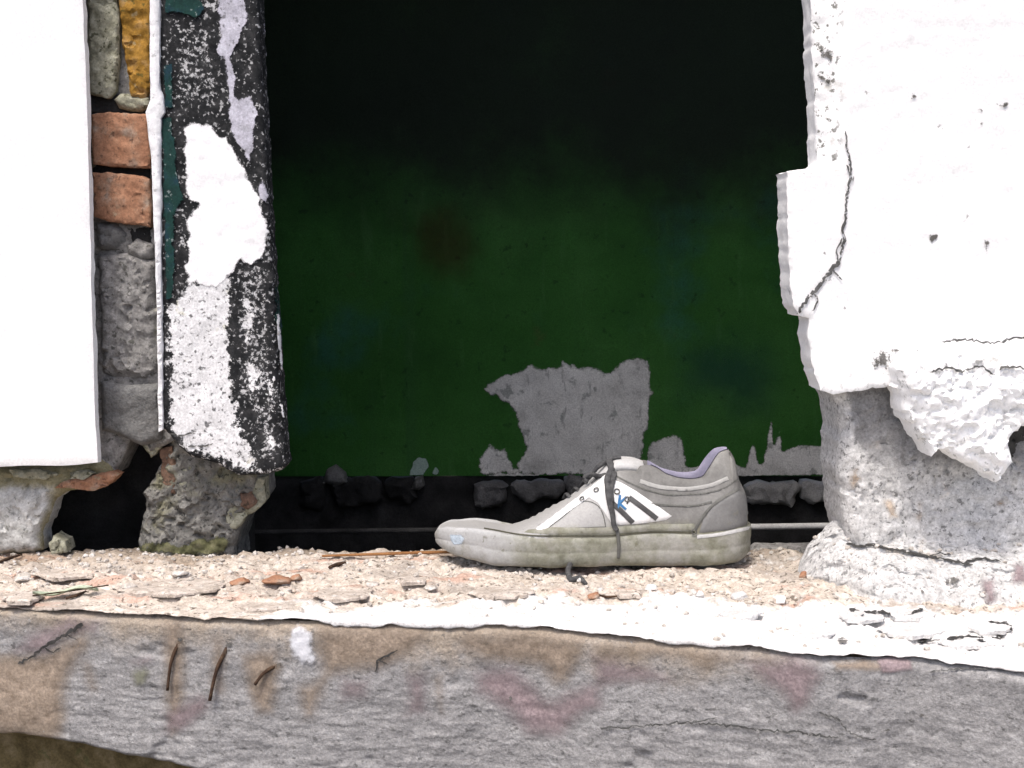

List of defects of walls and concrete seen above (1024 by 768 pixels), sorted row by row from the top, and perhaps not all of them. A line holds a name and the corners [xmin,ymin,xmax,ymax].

peeling [143,0,284,529]